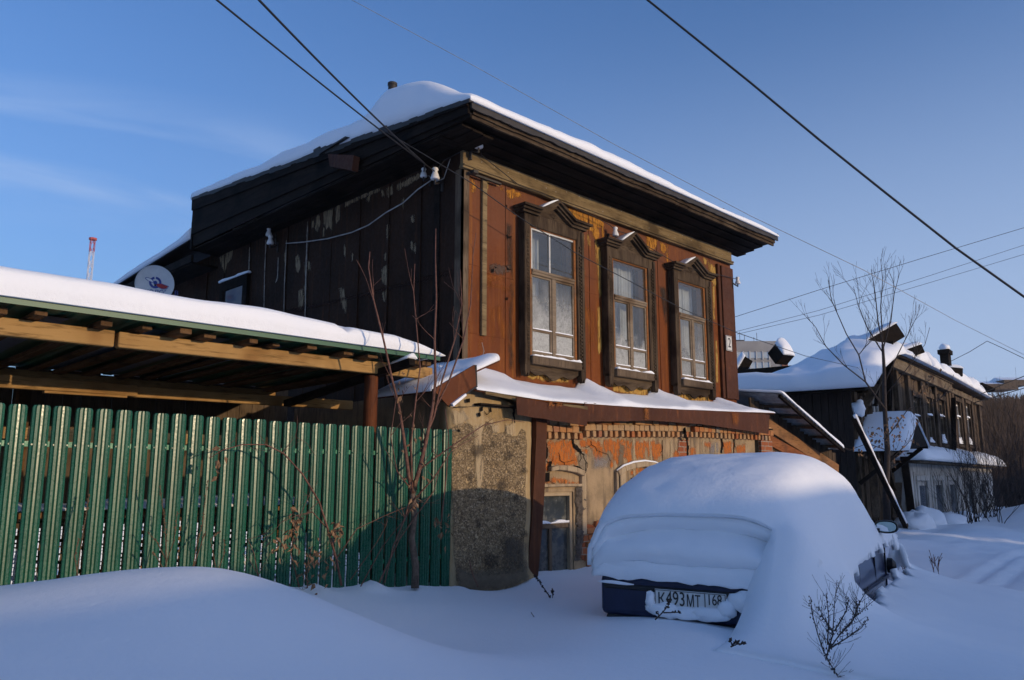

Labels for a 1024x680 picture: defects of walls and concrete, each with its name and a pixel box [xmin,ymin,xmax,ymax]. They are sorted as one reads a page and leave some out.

peeling [312,172,421,236]
peeling [546,439,746,567]